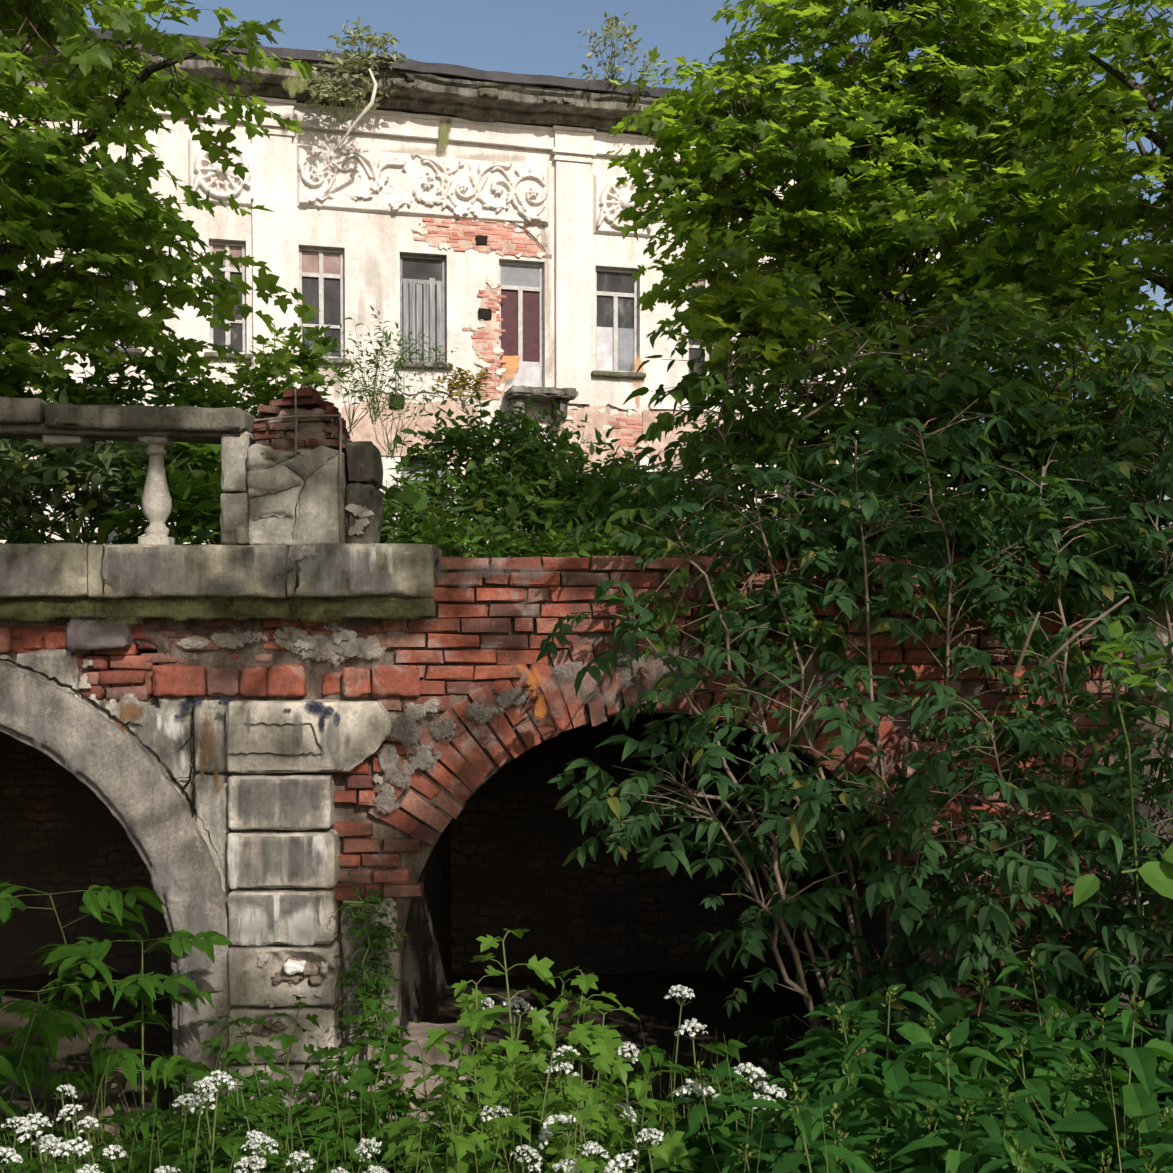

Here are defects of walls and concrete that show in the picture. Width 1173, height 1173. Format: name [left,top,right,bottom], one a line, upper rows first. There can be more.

spalling [412,218,552,259]
spalling [341,279,507,459]
crack [250,452,339,594]
peeling [177,621,410,665]
peeling [554,662,584,679]
peeling [617,653,650,667]
peeling [372,687,530,818]
crack [0,658,231,892]
spalling [257,954,329,998]
spalling [246,998,288,1038]